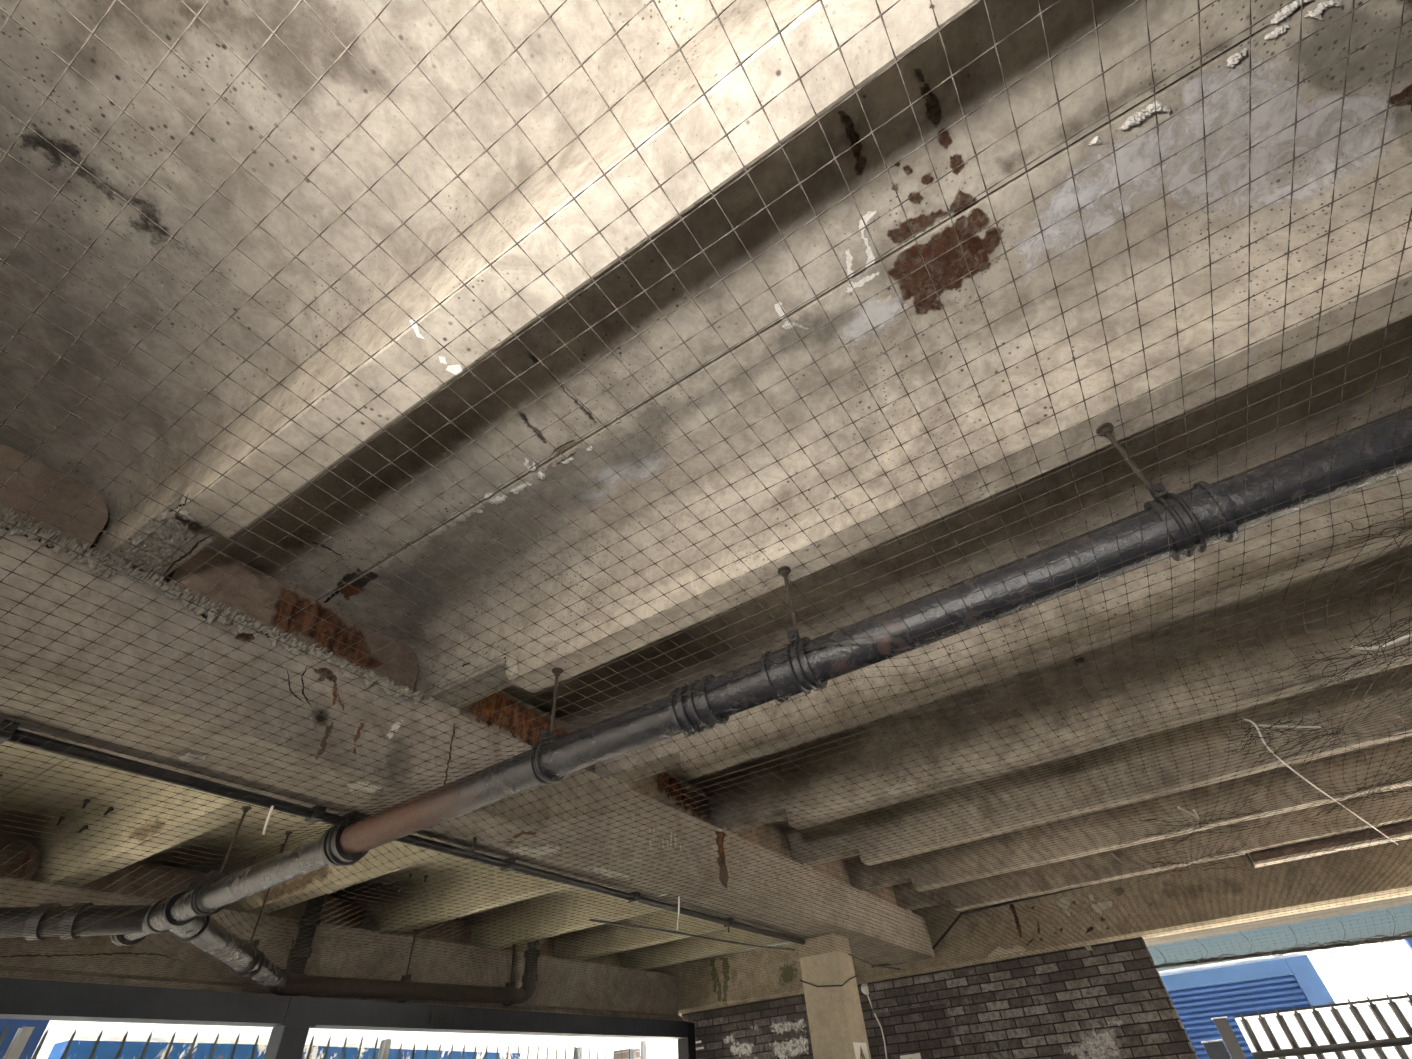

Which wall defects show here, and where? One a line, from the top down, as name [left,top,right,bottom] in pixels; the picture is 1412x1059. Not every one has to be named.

damp [1264,0,1343,40]
damp [21,130,167,244]
rust [838,111,867,175]
rust [915,69,964,174]
damp [1019,46,1412,275]
rust [887,162,1003,314]
damp [850,303,899,340]
spalling [0,504,519,710]
spalling [736,739,786,759]
rust [715,831,729,888]
damp [724,1019,808,1059]
damp [1064,1021,1122,1059]